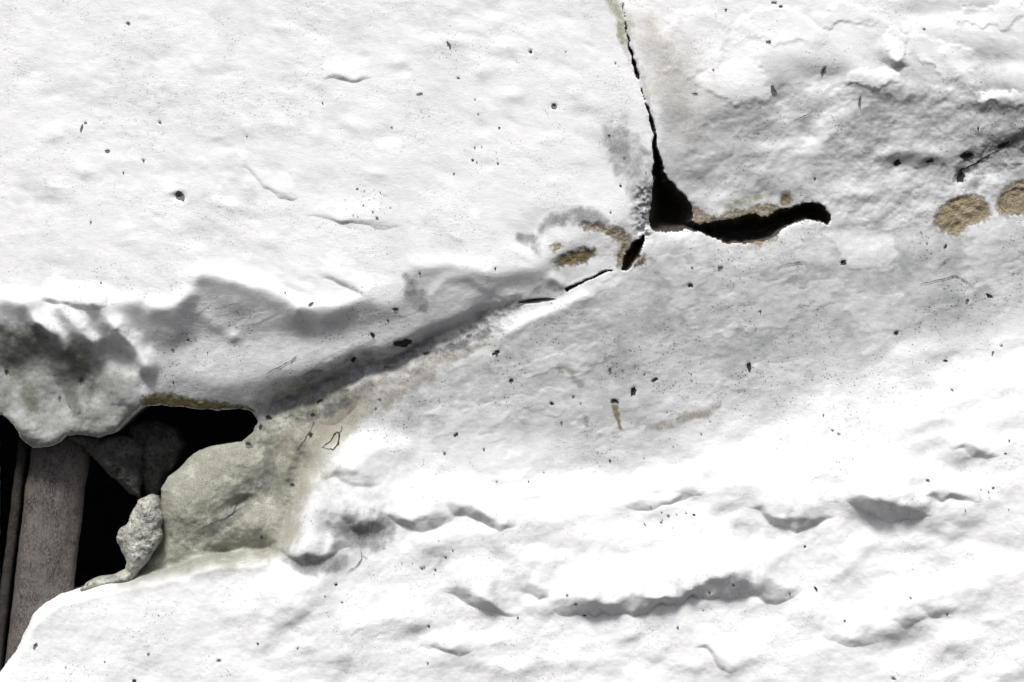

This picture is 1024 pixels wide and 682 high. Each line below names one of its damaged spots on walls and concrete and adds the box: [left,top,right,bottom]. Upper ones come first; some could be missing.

crack [622,5,656,134]
spalling [550,243,596,267]
crack [565,269,612,292]
spalling [579,212,645,271]
spalling [933,181,1024,248]
spalling [140,381,254,412]